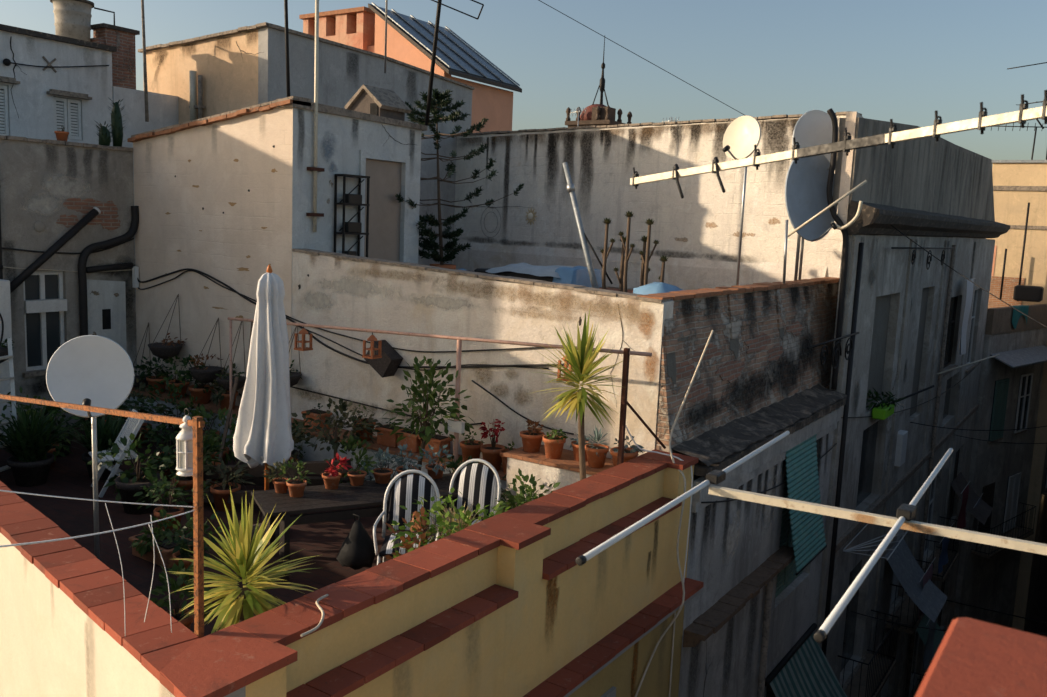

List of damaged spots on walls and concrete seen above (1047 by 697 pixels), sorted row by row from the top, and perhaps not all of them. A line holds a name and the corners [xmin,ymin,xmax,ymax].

damp [461,124,728,213]
damp [760,119,798,172]
spalling [56,198,120,231]
damp [726,334,816,415]